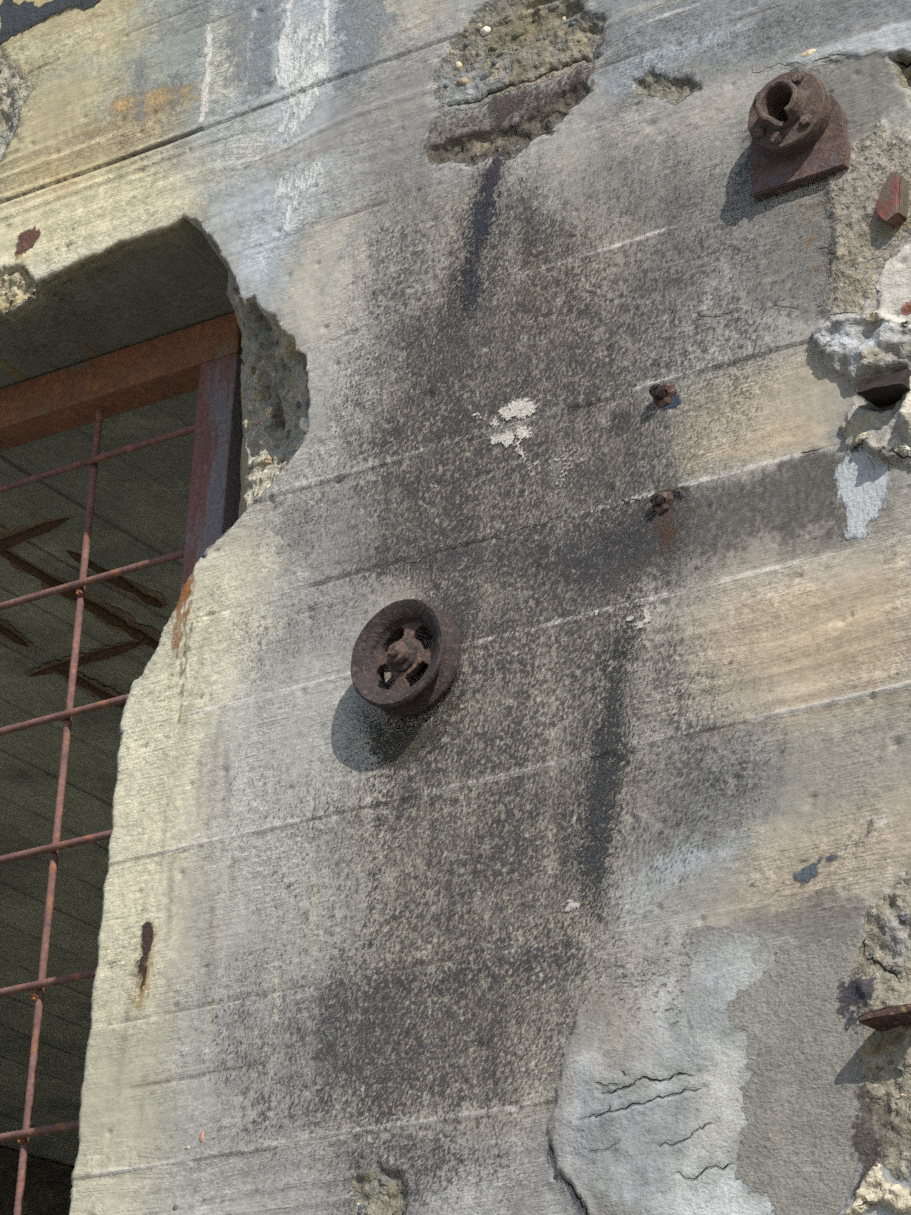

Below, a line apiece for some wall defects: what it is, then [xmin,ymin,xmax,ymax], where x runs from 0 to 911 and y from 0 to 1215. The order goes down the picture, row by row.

spalling [0,52,34,161]
damp [197,0,396,144]
spalling [424,0,607,167]
damp [616,1,809,99]
spalling [189,217,310,509]
damp [194,134,891,1215]
rust [136,921,156,1009]
crack [579,1071,704,1120]
spalling [844,869,911,1215]
spalling [350,1163,411,1215]
crack [549,1144,588,1215]
crack [658,1122,736,1180]